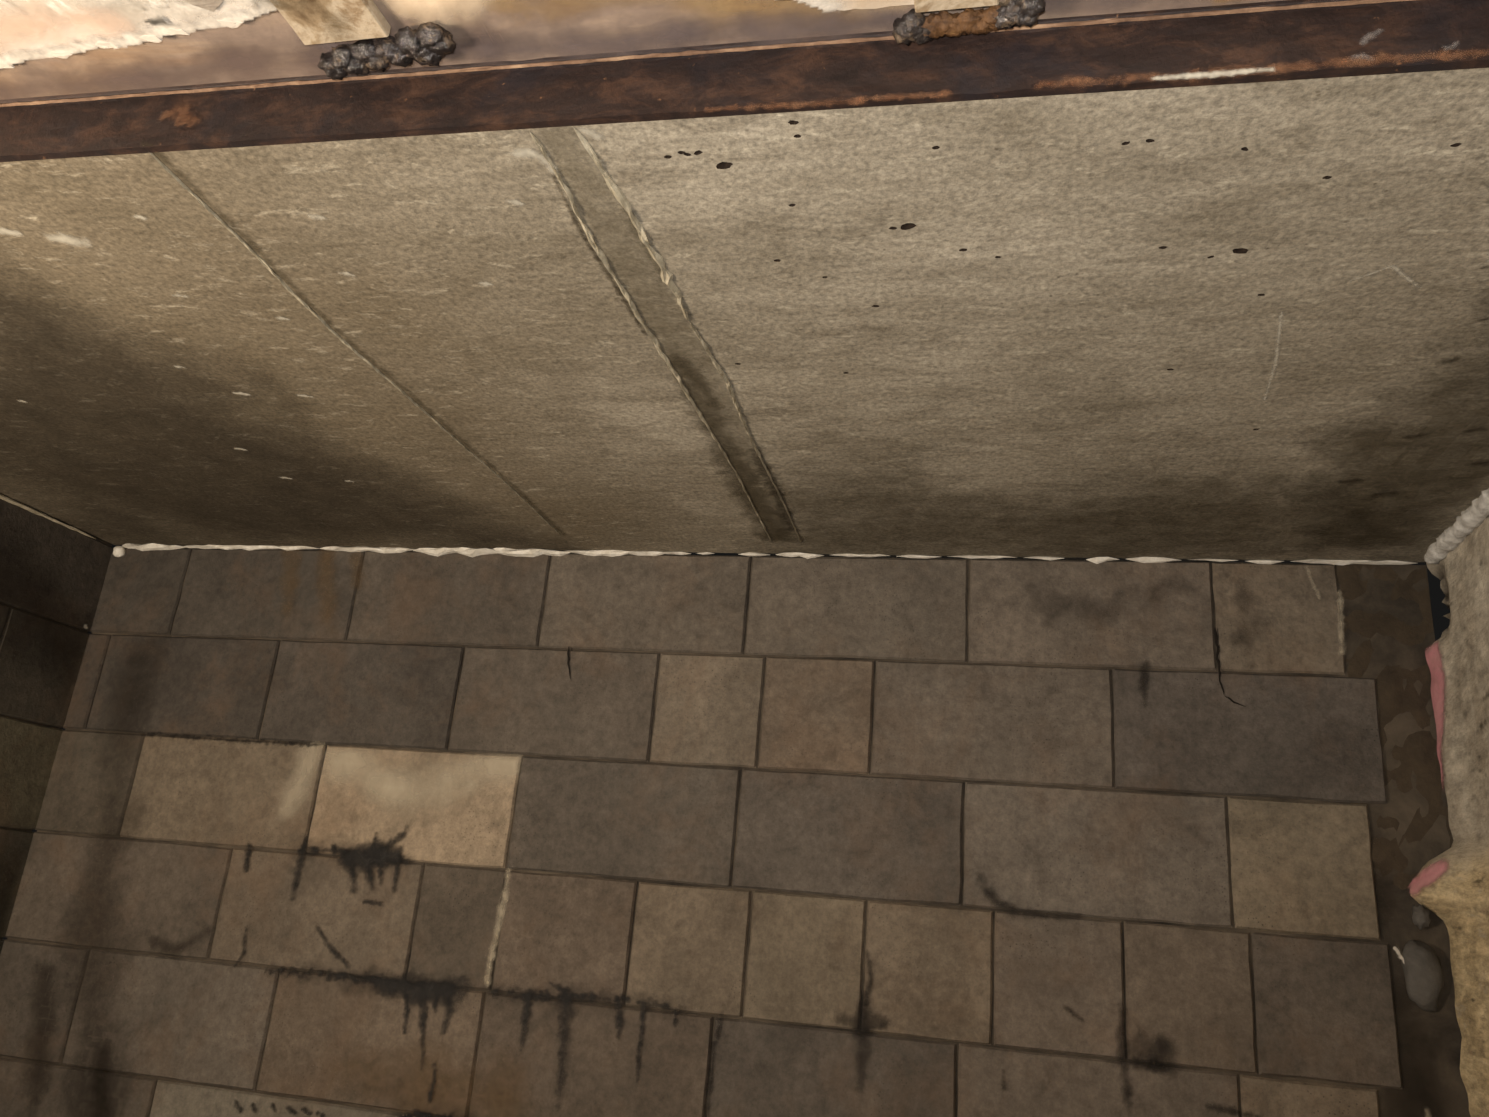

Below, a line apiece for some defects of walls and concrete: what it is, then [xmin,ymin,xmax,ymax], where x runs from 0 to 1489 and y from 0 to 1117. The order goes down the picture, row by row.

rust [689,0,792,14]
flaking render [798,0,835,11]
peeling [0,0,276,69]
peeling [1154,68,1273,79]
rust [1040,78,1091,86]
rust [851,91,948,104]
damp [1344,369,1489,538]
damp [292,831,408,906]
damp [270,927,463,1117]
damp [491,985,678,1090]
damp [235,1101,324,1117]